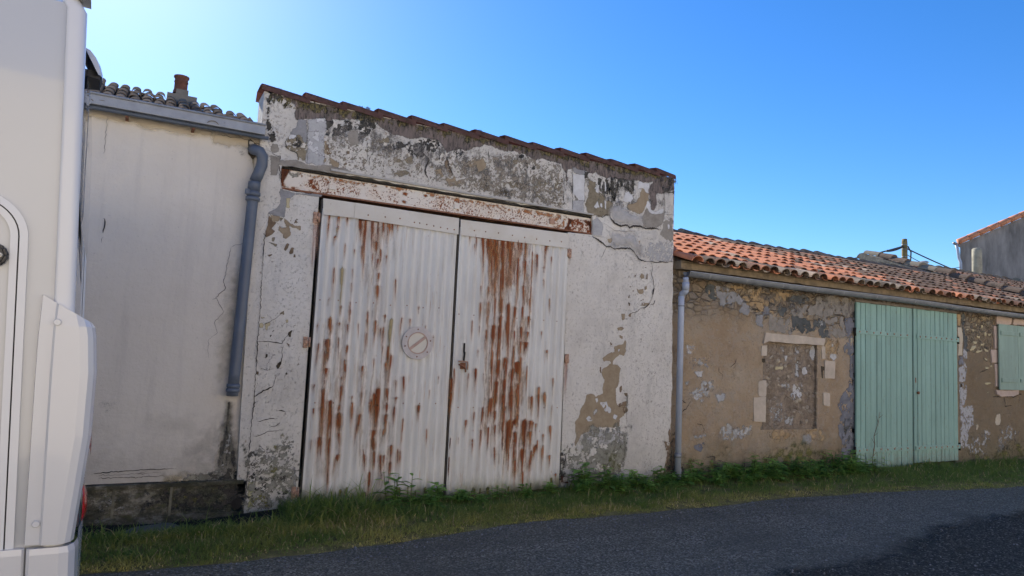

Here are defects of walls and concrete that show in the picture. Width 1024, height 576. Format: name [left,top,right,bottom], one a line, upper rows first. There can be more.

crack [208,231,289,494]
peeling [265,193,322,257]
rust [313,211,419,489]
rust [281,169,592,233]
peeling [248,118,674,241]
rust [465,236,568,484]
peeling [574,267,649,446]
crack [592,197,673,314]
flaking render [731,285,791,328]
flaking render [817,319,853,378]
flaking render [957,314,994,393]
damp [146,402,237,483]